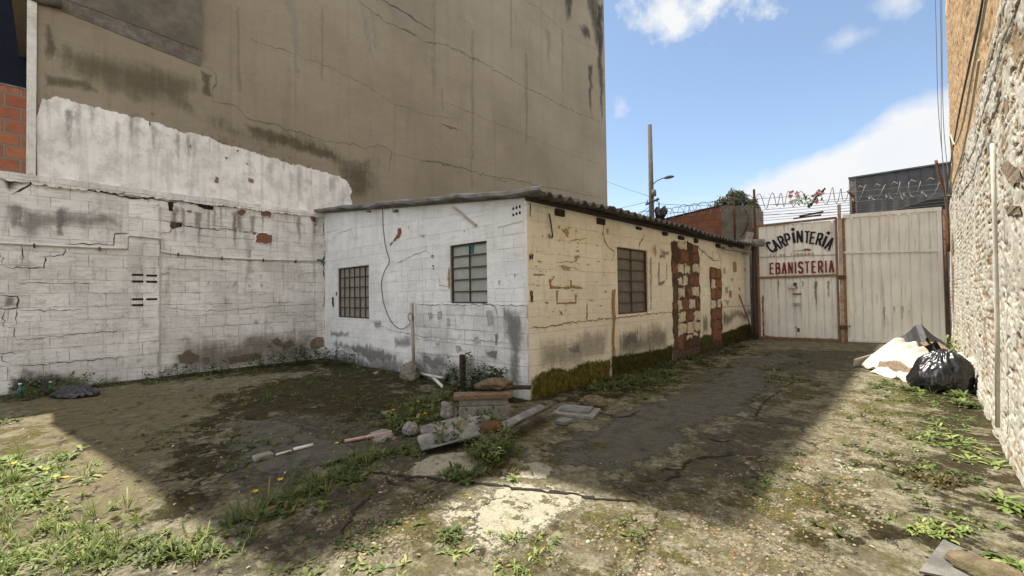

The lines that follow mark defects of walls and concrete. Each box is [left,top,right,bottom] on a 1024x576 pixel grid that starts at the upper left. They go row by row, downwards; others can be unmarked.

damp [251,128,333,157]
damp [11,206,106,234]
crack [88,189,247,234]
crack [0,233,128,369]
peeling [530,225,616,355]
flaking render [658,240,746,360]
peeling [174,349,208,367]
peeling [272,337,325,349]
damp [332,332,409,372]
damp [417,355,498,391]
damp [620,331,665,353]